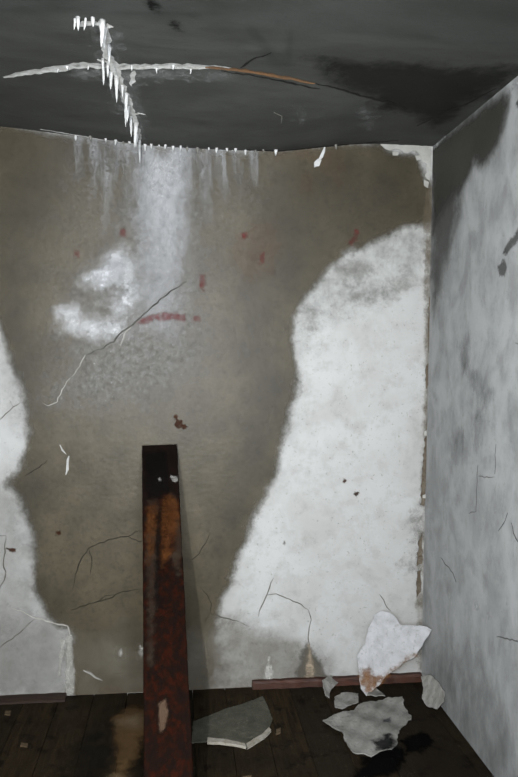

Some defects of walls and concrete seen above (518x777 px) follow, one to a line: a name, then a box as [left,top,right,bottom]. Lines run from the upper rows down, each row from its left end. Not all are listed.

leakage [326,61,518,124]
crack [43,281,187,406]
leakage [0,94,518,696]
crack [0,535,8,588]
crack [73,531,143,587]
crack [0,589,137,693]
crack [203,579,311,649]
rust [114,708,144,777]